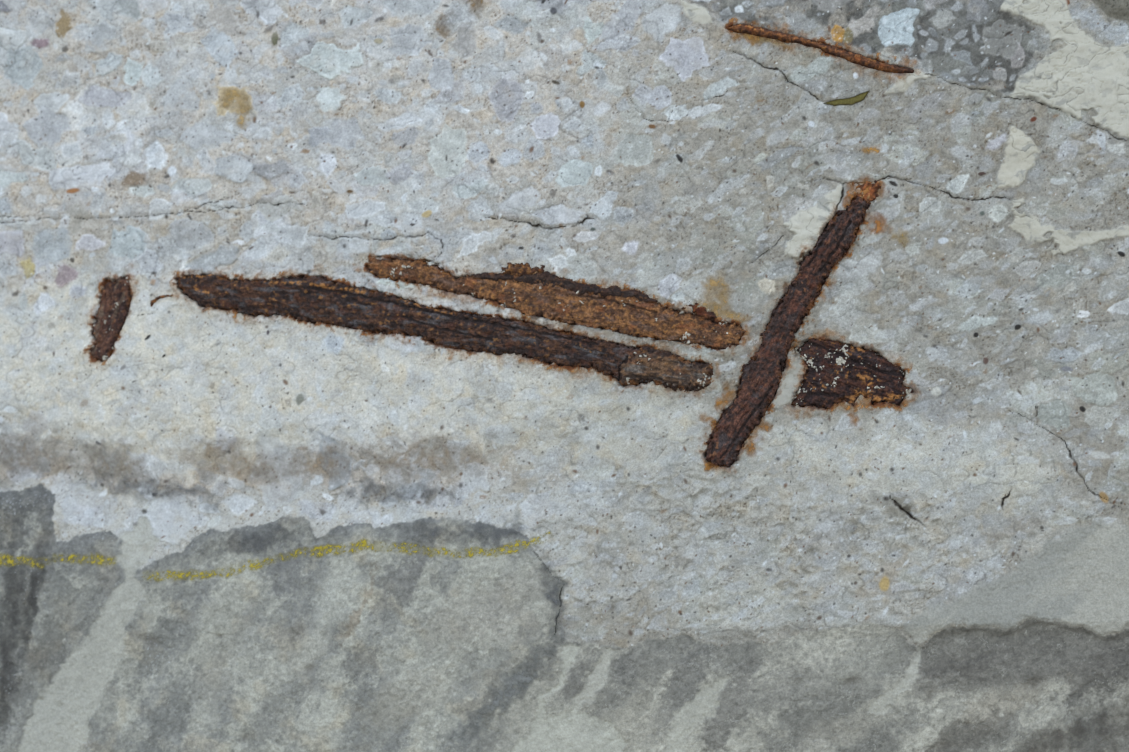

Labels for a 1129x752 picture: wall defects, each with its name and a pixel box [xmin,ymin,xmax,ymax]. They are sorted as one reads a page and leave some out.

spalling [642,3,681,44]
spalling [659,37,715,82]
crack [733,51,869,106]
corrosion [725,18,916,79]
spalling [555,159,594,187]
spalling [530,205,587,225]
flaking render [784,184,843,259]
spalling [184,245,239,275]
spalling [834,256,881,285]
corrosion [84,274,134,366]
corrosion [169,178,913,470]
spalling [142,490,198,547]